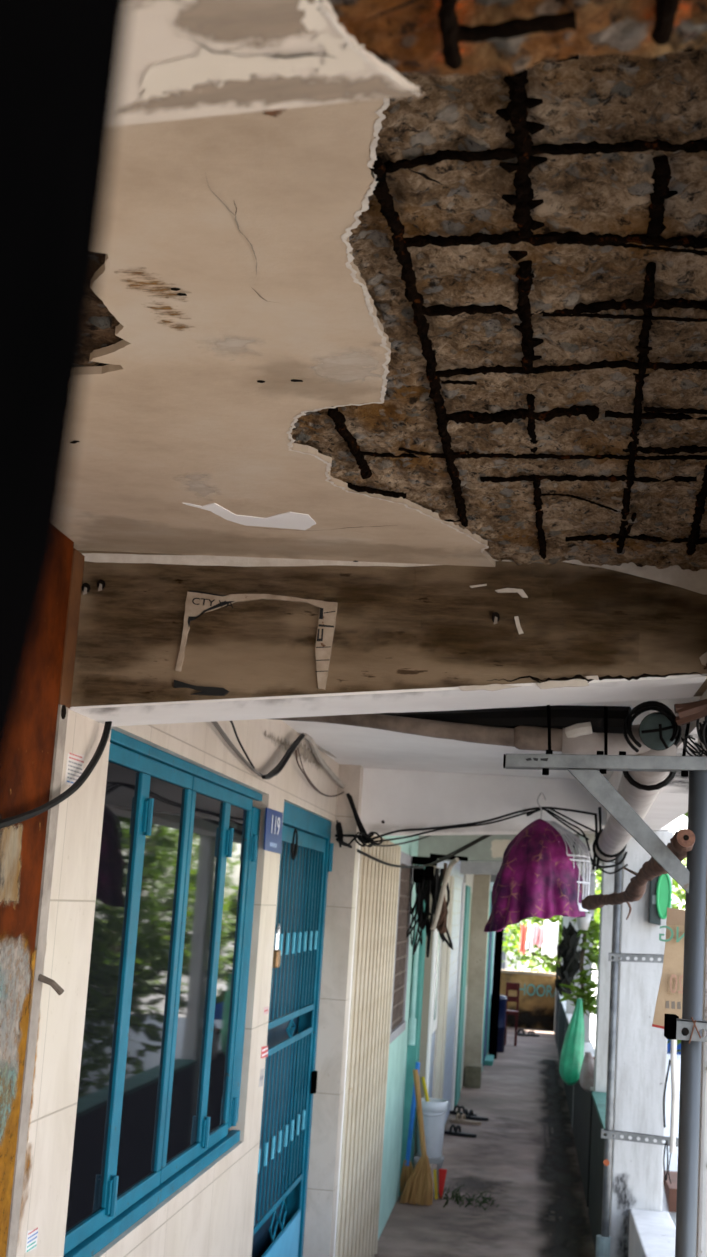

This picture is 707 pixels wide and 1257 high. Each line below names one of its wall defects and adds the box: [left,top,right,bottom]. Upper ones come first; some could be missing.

corrosion [674,2,692,27]
peeling [122,0,489,552]
damp [76,565,681,712]